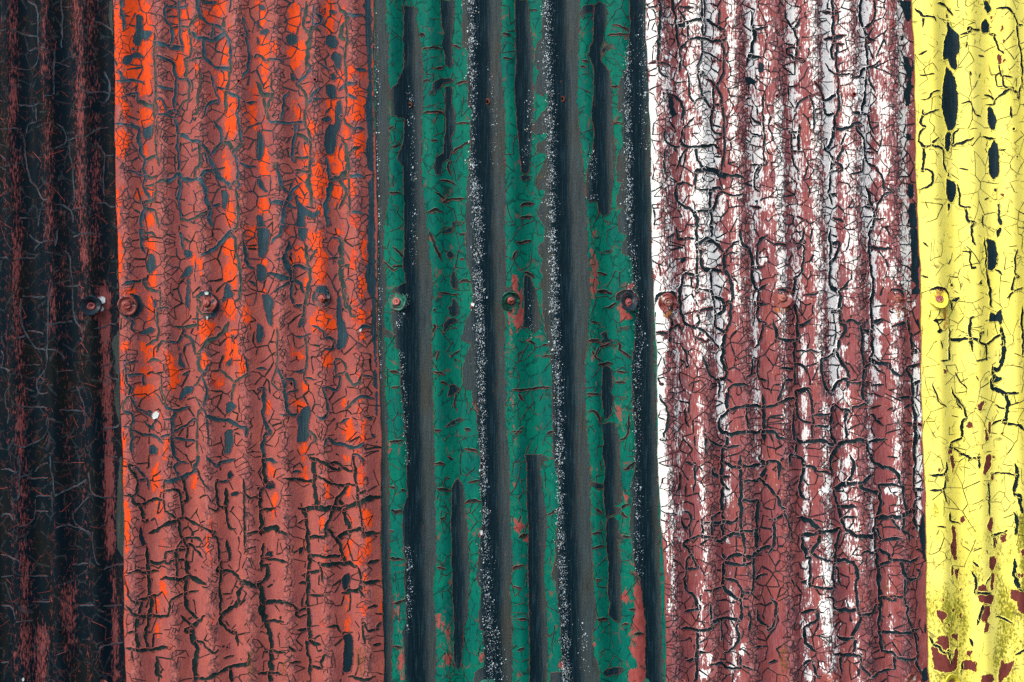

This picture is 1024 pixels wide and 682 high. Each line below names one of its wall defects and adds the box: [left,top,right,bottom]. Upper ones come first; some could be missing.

peeling [108,0,164,159]
crack [501,0,544,61]
peeling [941,9,961,154]
peeling [99,44,275,559]
crack [0,0,486,682]
peeling [290,0,664,682]
crack [502,135,544,293]
crack [577,0,1024,682]
peeling [907,184,924,298]
peeling [987,106,1007,227]
crack [508,564,561,682]
peeling [922,595,1016,682]